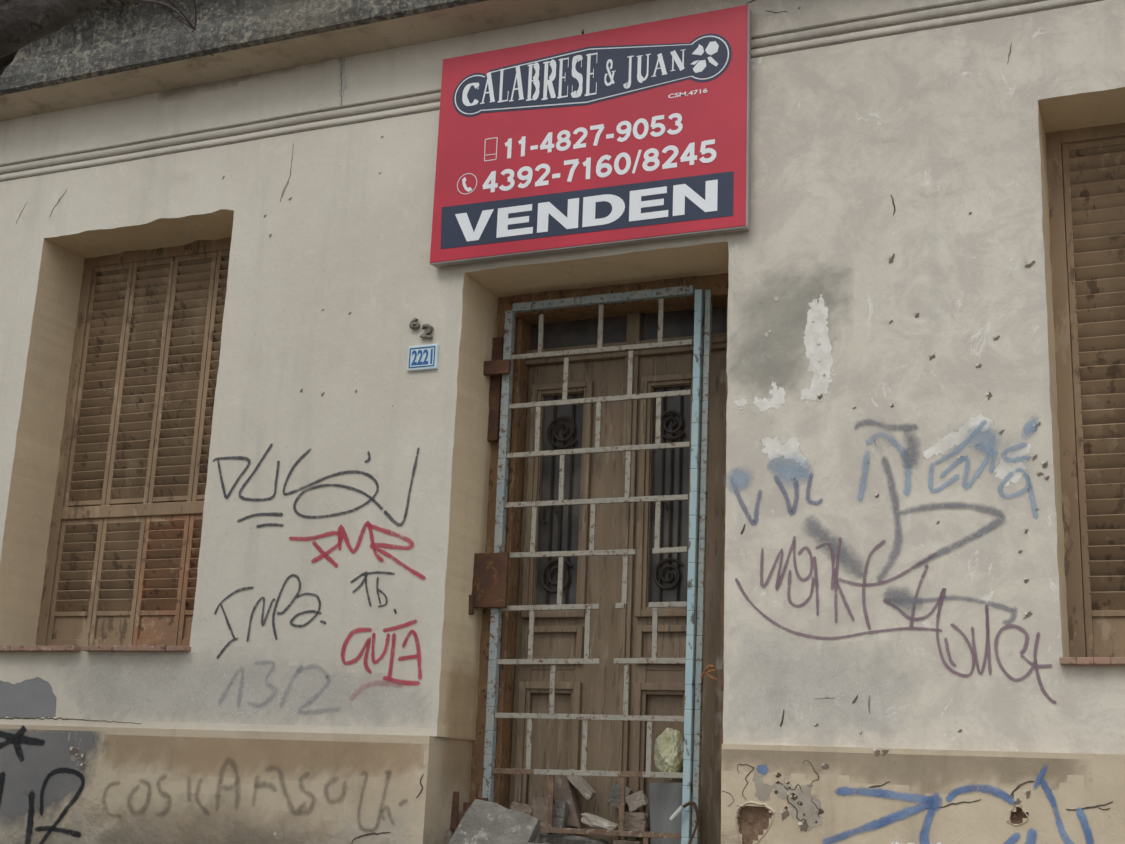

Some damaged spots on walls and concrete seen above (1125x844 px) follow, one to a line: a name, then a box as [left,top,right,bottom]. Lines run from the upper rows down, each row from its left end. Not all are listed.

peeling [732,294,835,412]
peeling [759,436,808,481]
spalling [726,772,824,844]
spalling [1007,789,1031,826]